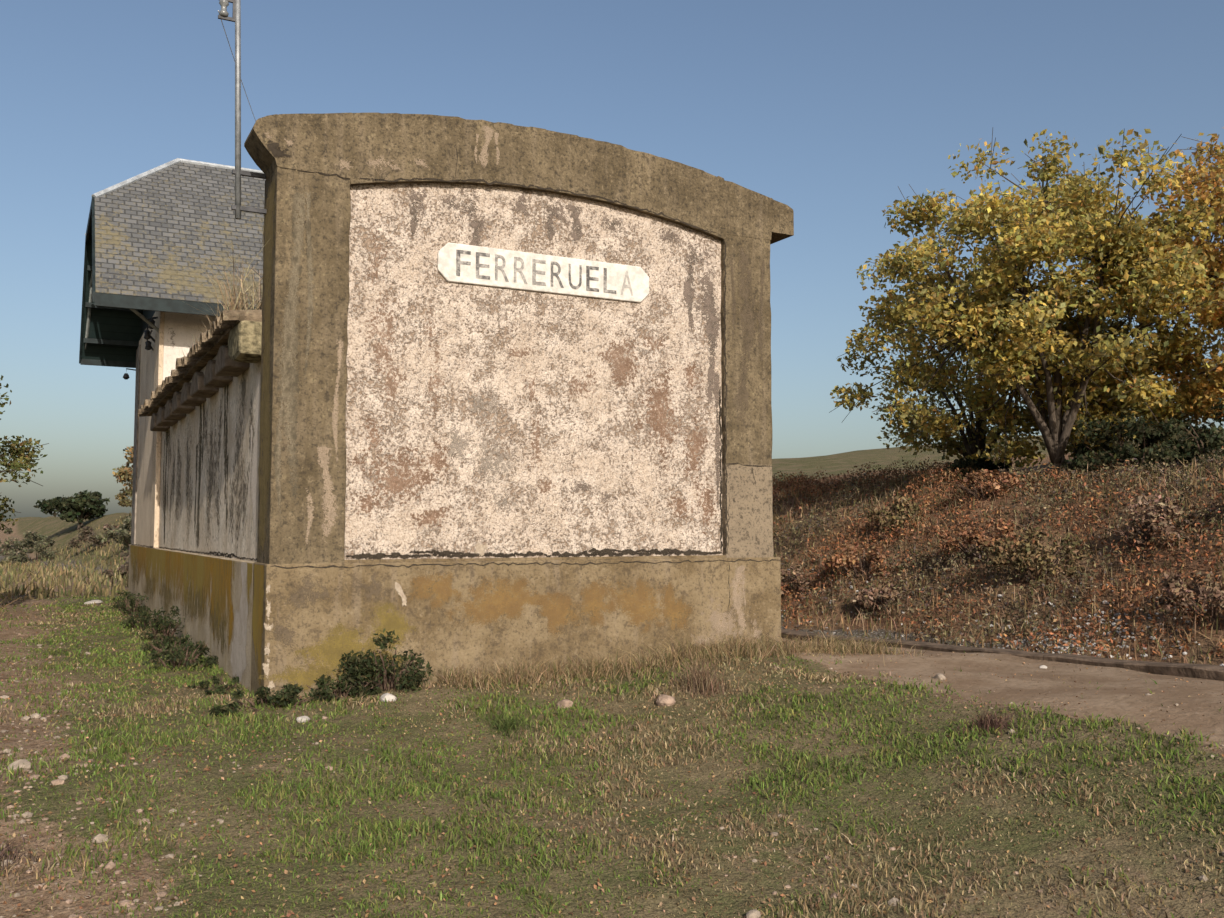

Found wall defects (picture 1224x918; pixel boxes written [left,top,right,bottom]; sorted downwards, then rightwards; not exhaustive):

peeling [347,230,460,530]
leakage [129,184,765,679]
peeling [507,344,616,502]
peeling [567,328,719,534]
peeling [474,541,488,557]